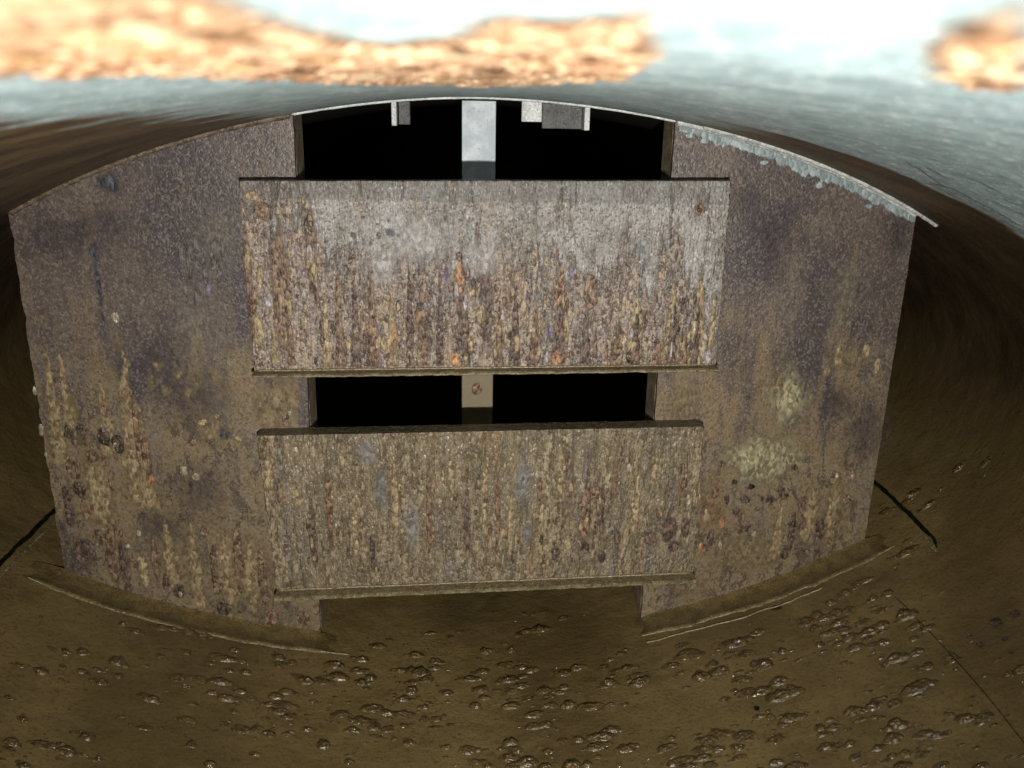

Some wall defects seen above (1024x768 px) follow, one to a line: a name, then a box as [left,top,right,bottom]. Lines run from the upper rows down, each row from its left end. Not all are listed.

peeling [679,126,915,222]
corrosion [297,214,717,367]
leakage [774,370,804,421]
corrosion [32,336,310,628]
corrosion [306,477,339,564]
corrosion [347,496,378,573]
corrosion [392,463,405,544]
corrosion [421,457,517,564]
corrosion [535,447,662,566]
leakage [718,439,800,489]
corrosion [732,471,856,561]
corrosion [8,644,149,686]